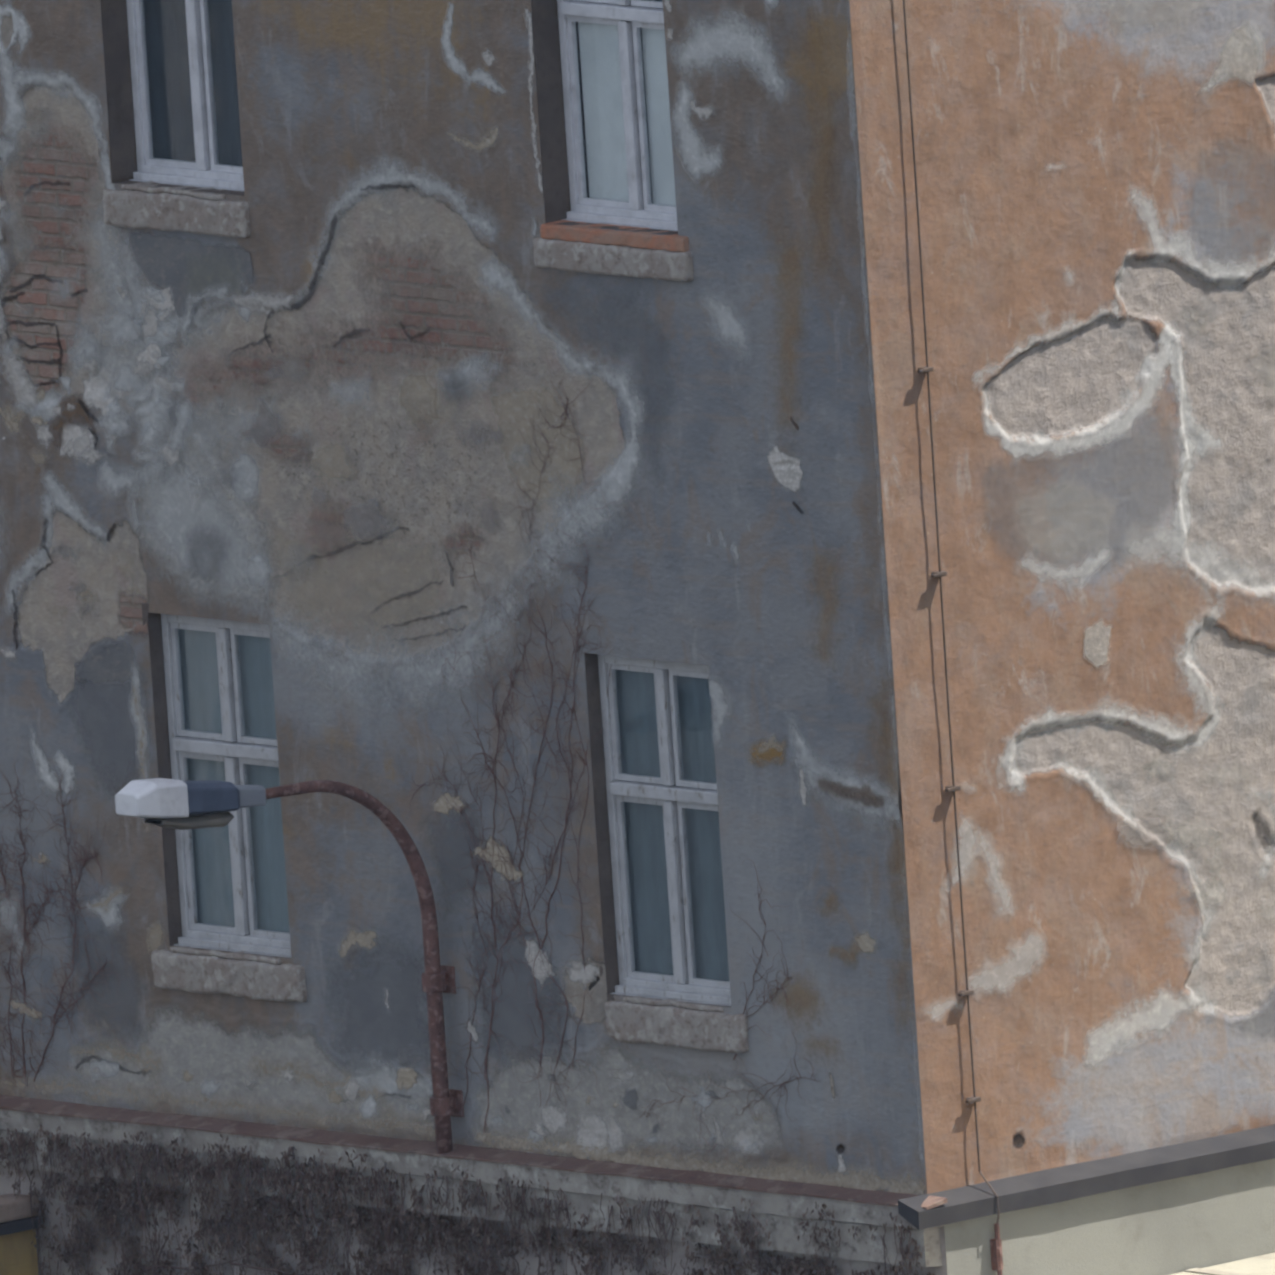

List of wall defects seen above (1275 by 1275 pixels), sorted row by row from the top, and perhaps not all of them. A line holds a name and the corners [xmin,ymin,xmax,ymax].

spalling [0,3,644,779]
spalling [767,446,804,514]
spalling [31,729,75,793]
spalling [434,793,465,814]
spalling [474,836,522,880]